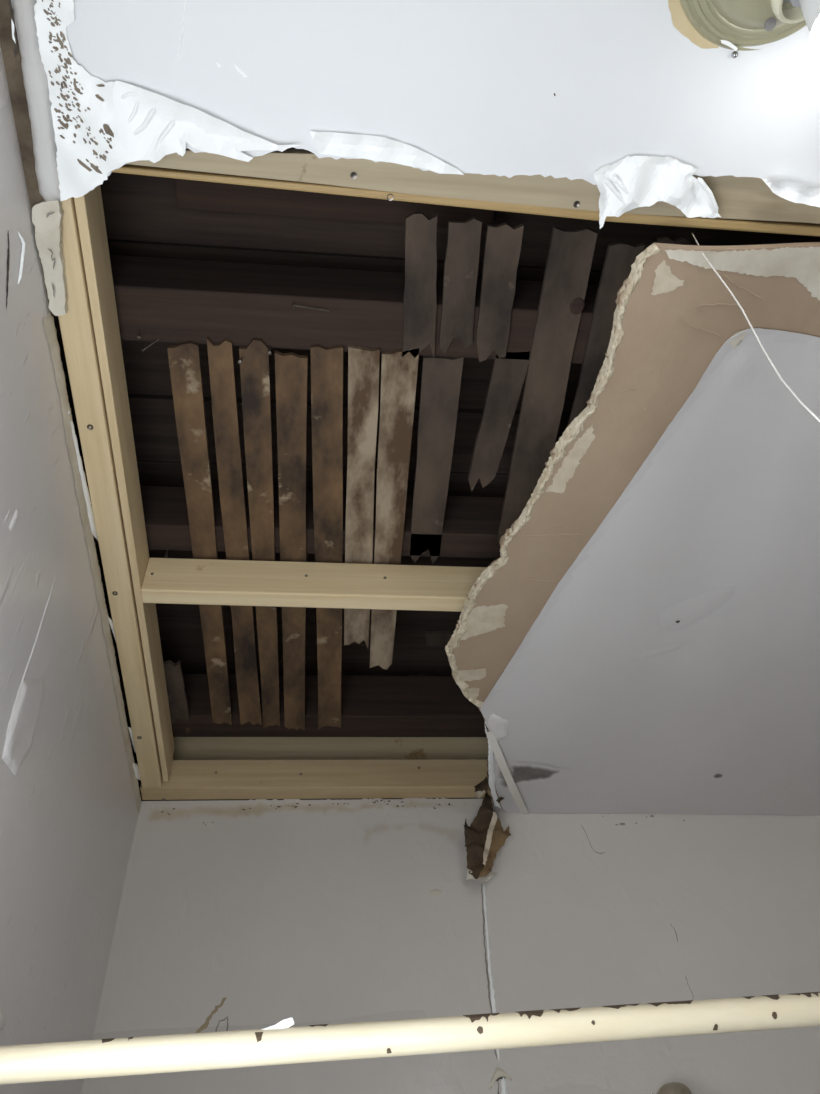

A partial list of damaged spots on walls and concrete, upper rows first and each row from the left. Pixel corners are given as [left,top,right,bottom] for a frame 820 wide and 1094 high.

peeling [594,155,721,229]
peeling [761,178,820,208]
peeling [68,411,98,541]
spalling [445,243,660,707]
peeling [485,726,501,809]
crack [481,883,496,1013]
crack [488,1049,512,1094]